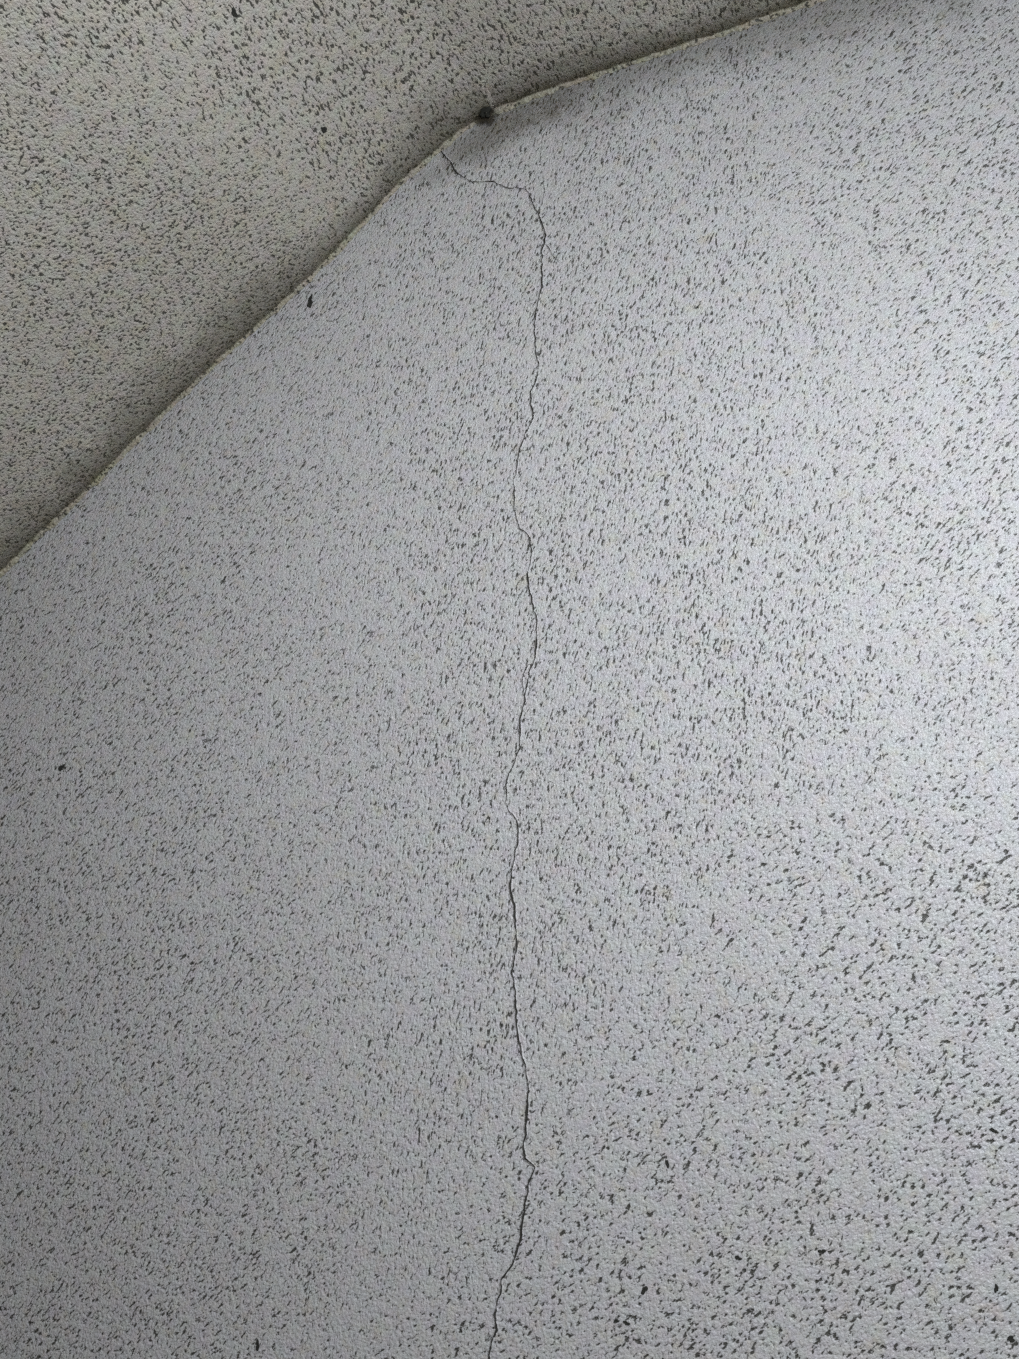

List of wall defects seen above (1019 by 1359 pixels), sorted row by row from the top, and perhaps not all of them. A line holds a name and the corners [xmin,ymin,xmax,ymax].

crack [440,151,560,1359]